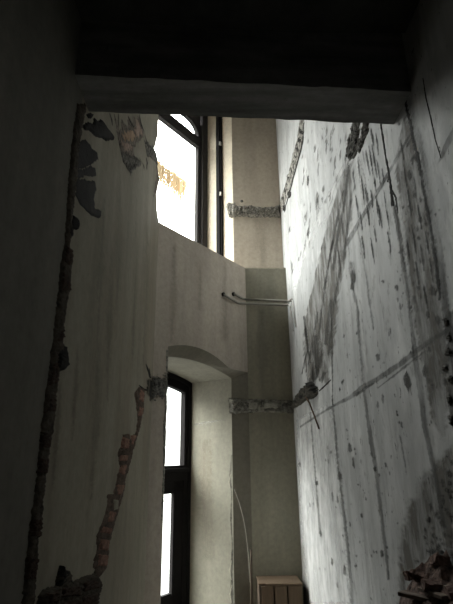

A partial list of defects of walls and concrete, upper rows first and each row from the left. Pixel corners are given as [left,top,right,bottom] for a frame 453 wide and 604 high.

spalling [226,120,309,219]
spalling [340,123,369,161]
flaking render [21,103,168,604]
spalling [228,381,320,429]